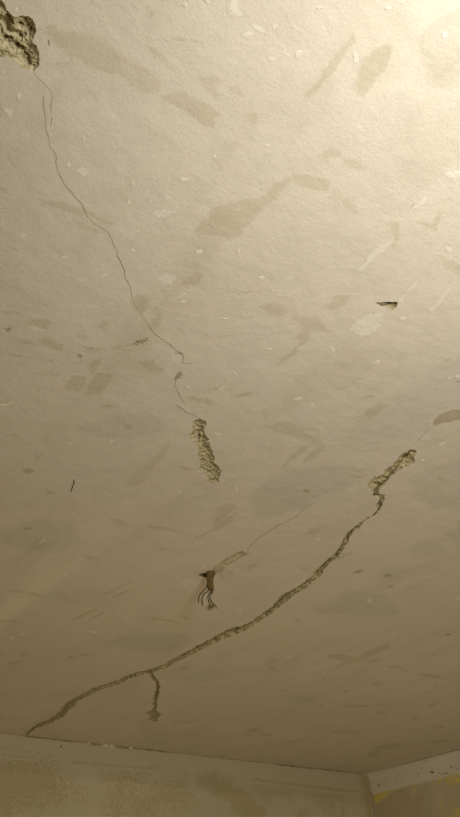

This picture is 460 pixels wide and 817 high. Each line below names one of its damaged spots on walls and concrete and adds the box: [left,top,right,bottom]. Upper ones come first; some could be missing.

flaking render [0,0,40,72]
flaking render [189,419,222,484]
crack [0,430,428,774]
leakage [117,763,247,817]